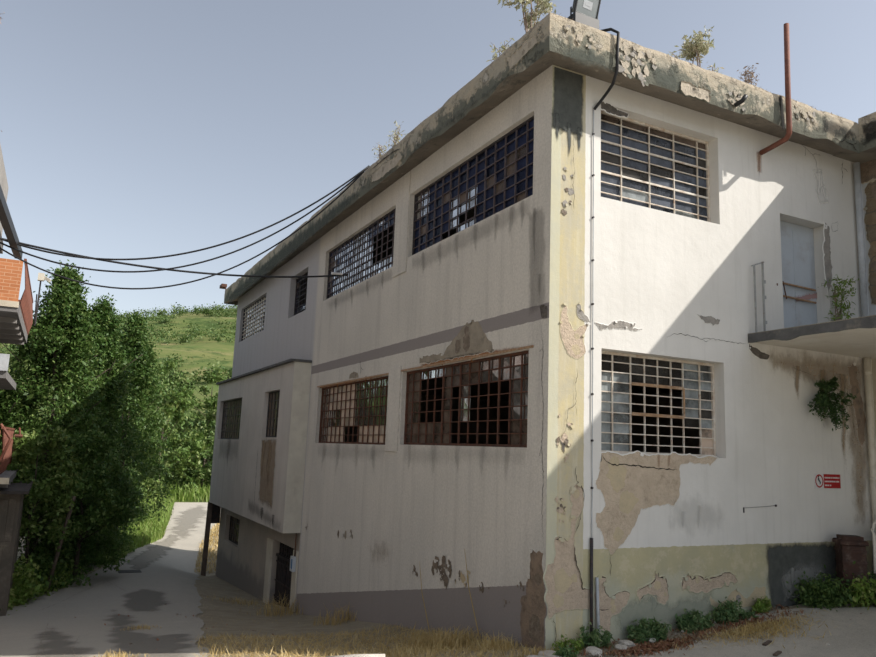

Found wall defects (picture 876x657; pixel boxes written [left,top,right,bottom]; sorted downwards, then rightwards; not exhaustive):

spalling [618,39,657,87]
damp [552,67,583,154]
spalling [860,159,876,305]
flaking render [419,319,495,364]
flaking render [559,302,642,360]
flaking render [697,314,720,326]
damp [777,358,866,510]
damp [259,440,276,507]
flaking render [594,450,718,556]
flaking render [431,555,470,588]
flaking render [503,480,670,650]
flaking render [680,570,767,609]